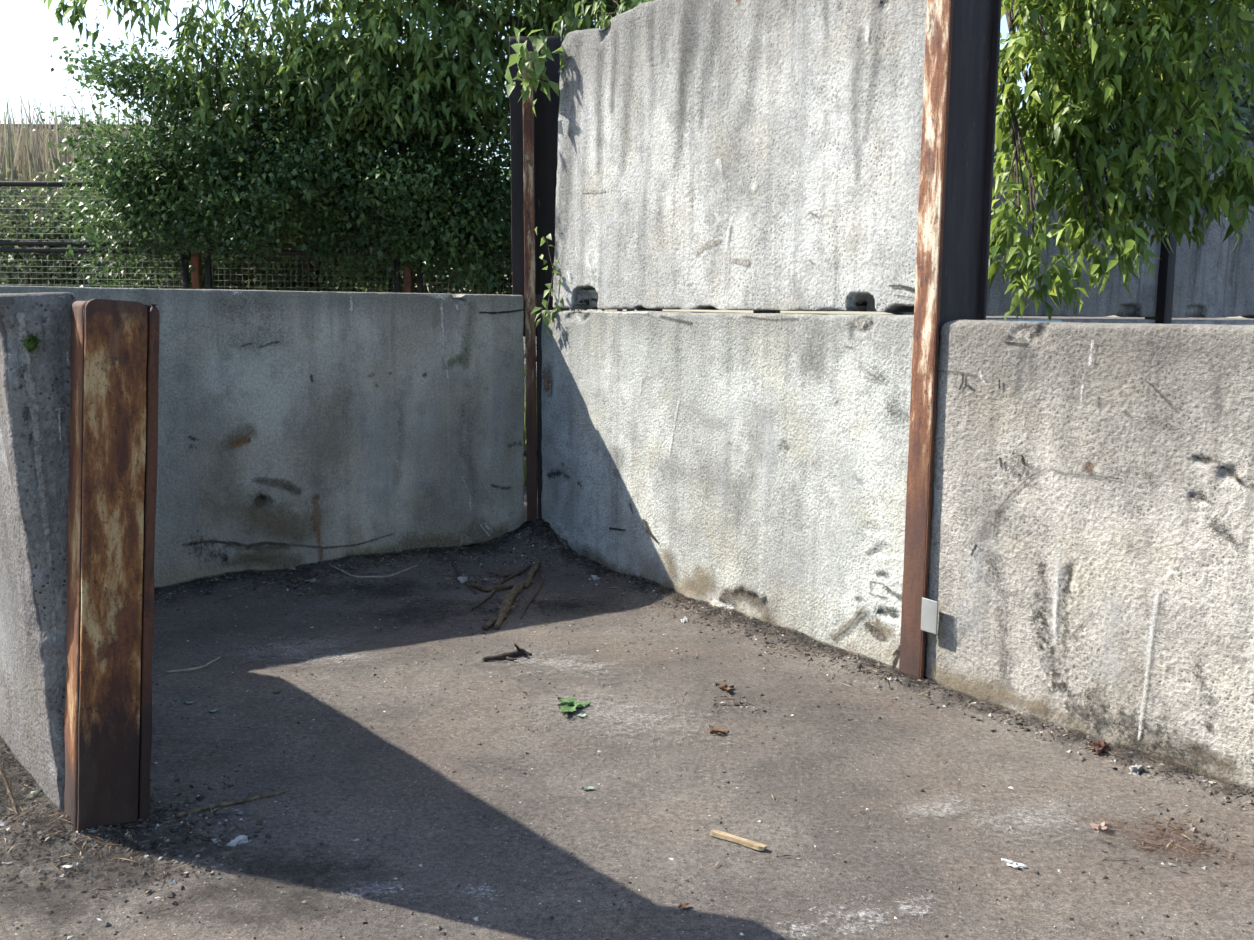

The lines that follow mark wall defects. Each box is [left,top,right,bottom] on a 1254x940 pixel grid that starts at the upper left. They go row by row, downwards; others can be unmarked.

leakage [984,553,1010,688]
leakage [1031,556,1254,779]